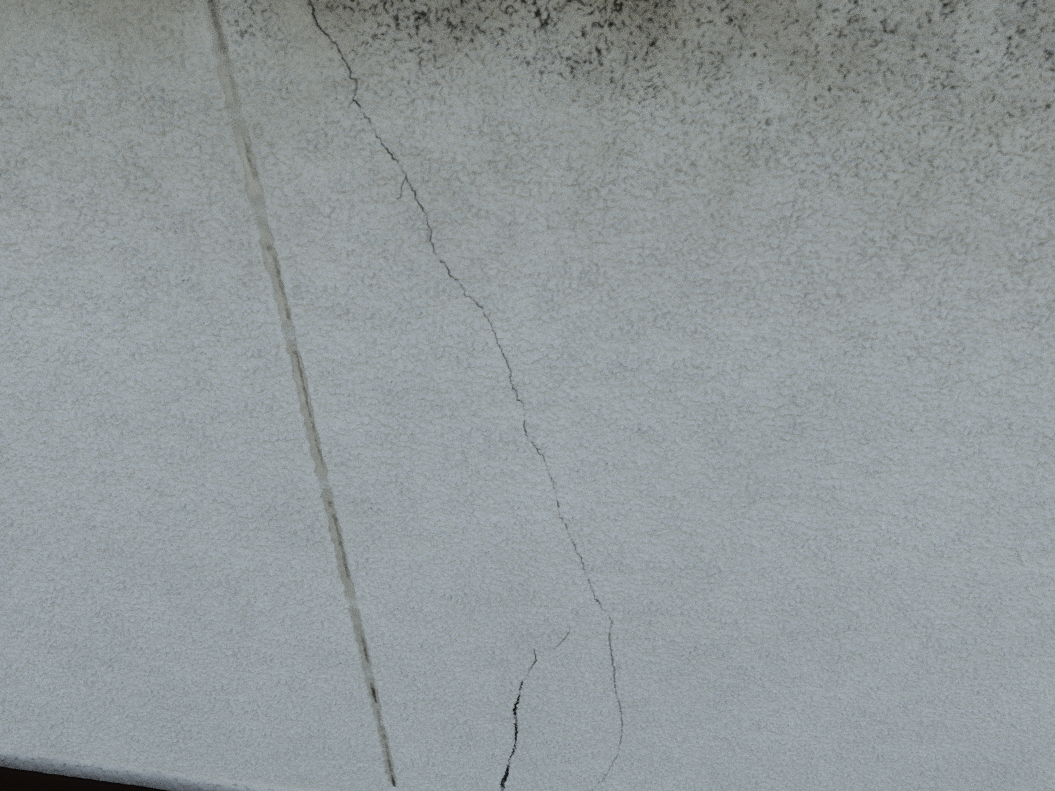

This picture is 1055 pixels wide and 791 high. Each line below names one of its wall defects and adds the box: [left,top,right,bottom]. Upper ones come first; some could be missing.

leakage [326,0,670,84]
crack [308,0,544,457]
crack [500,654,537,789]